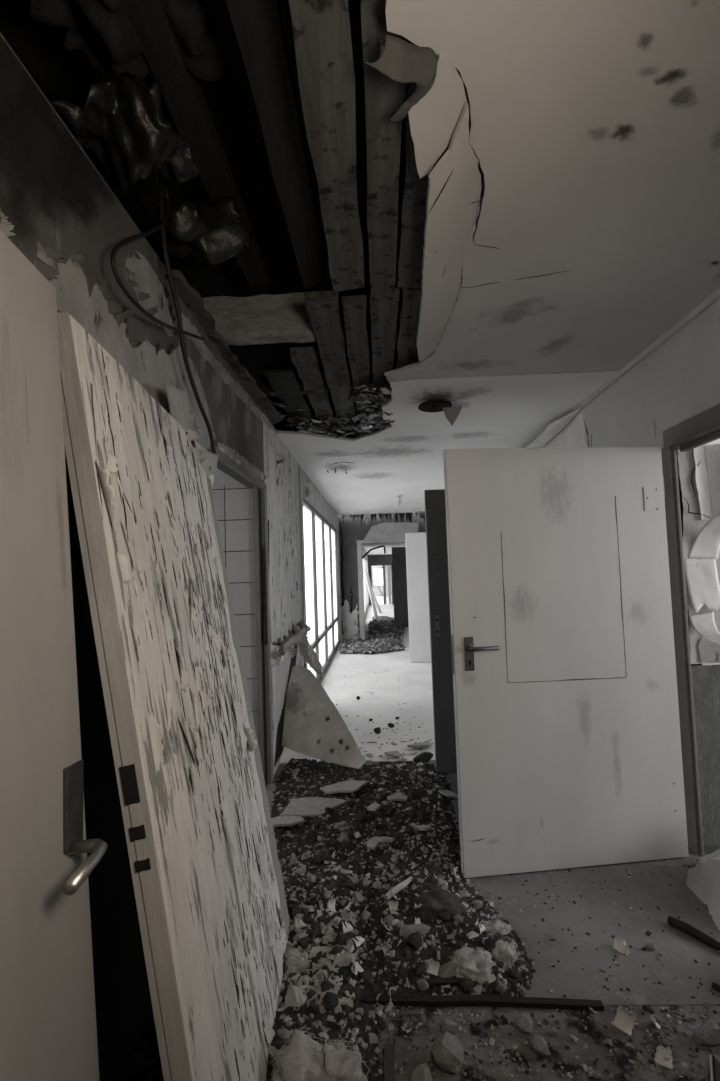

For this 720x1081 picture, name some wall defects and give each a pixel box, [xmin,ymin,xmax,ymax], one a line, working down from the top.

leakage [657,70,684,84]
peeling [34,241,314,1081]